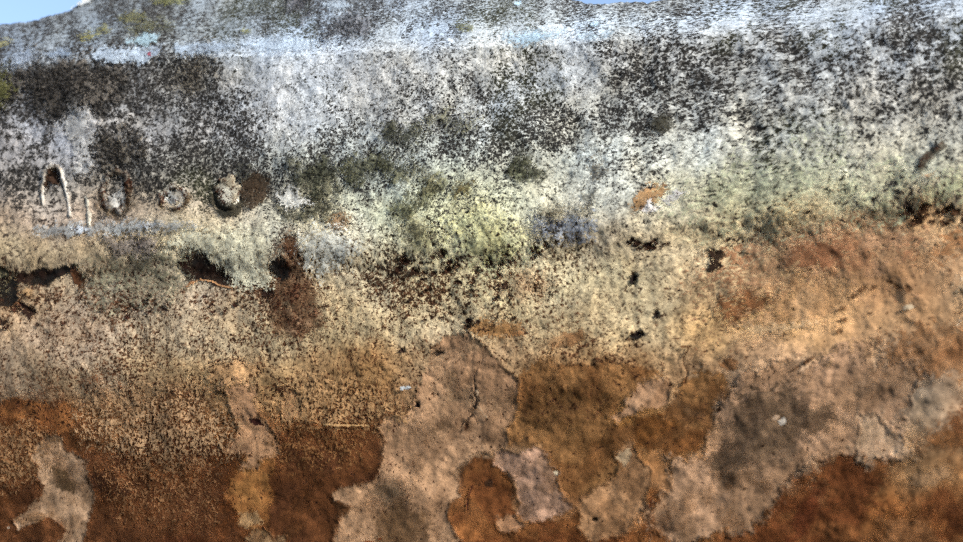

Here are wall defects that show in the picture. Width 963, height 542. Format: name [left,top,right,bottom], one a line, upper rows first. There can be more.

leakage [92,32,321,66]
leakage [59,107,99,179]
leakage [273,183,315,212]
rust [266,227,328,344]
leakage [294,219,370,286]
spalling [626,237,671,252]
rust [506,182,963,500]
peeling [0,243,926,542]
rust [0,357,403,542]
rust [448,455,676,542]
rust [716,452,963,542]
peeling [877,517,939,542]